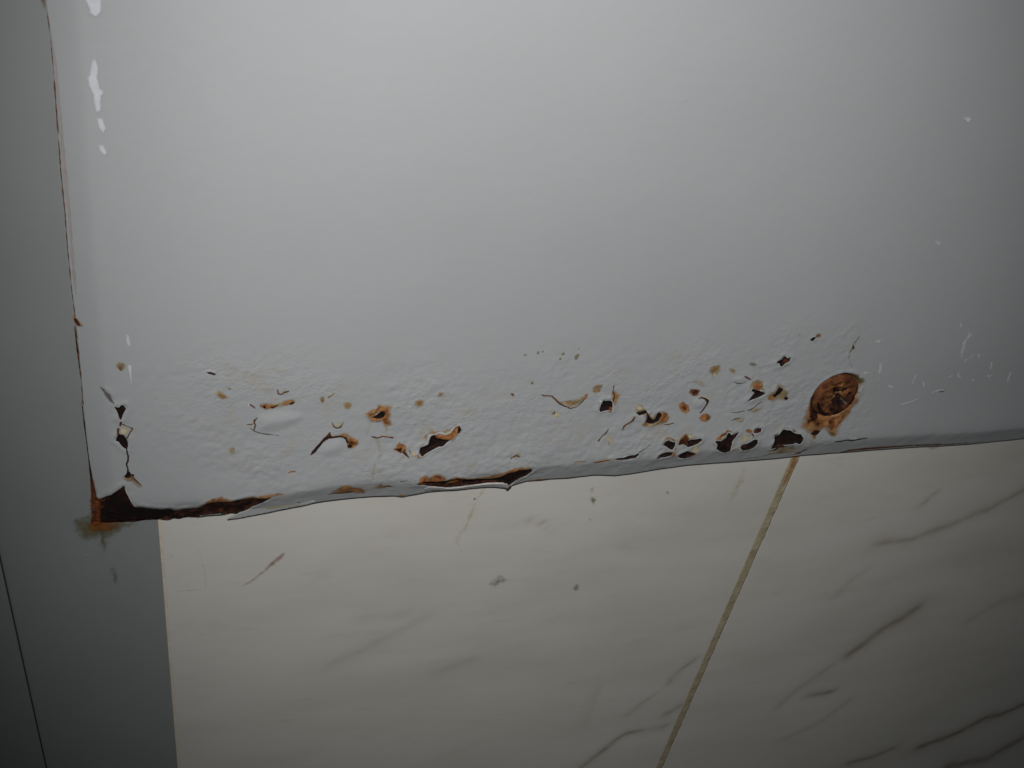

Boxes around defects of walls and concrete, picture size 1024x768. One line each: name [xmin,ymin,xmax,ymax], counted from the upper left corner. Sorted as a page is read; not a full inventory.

rust [366,405,416,458]
peeling [416,424,463,459]
rust [433,426,459,440]
rust [622,405,673,430]
rust [679,389,710,422]
peeling [662,429,805,454]
rust [802,373,862,439]